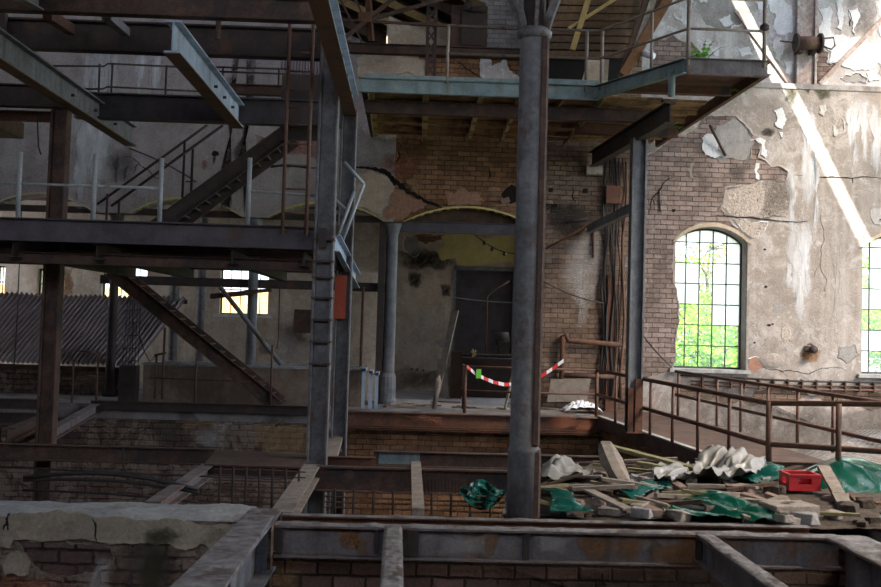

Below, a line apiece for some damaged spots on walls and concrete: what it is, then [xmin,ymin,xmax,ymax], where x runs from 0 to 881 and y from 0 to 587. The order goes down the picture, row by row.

peeling [817,0,881,85]
peeling [774,107,787,138]
efflorescence [847,110,880,159]
crack [356,150,442,208]
water stain [770,128,818,217]
crack [789,174,878,183]
peeling [870,208,881,226]
flaking render [643,114,793,382]
efflorescence [787,241,809,304]
crack [2,513,10,531]
flaking render [13,539,114,578]